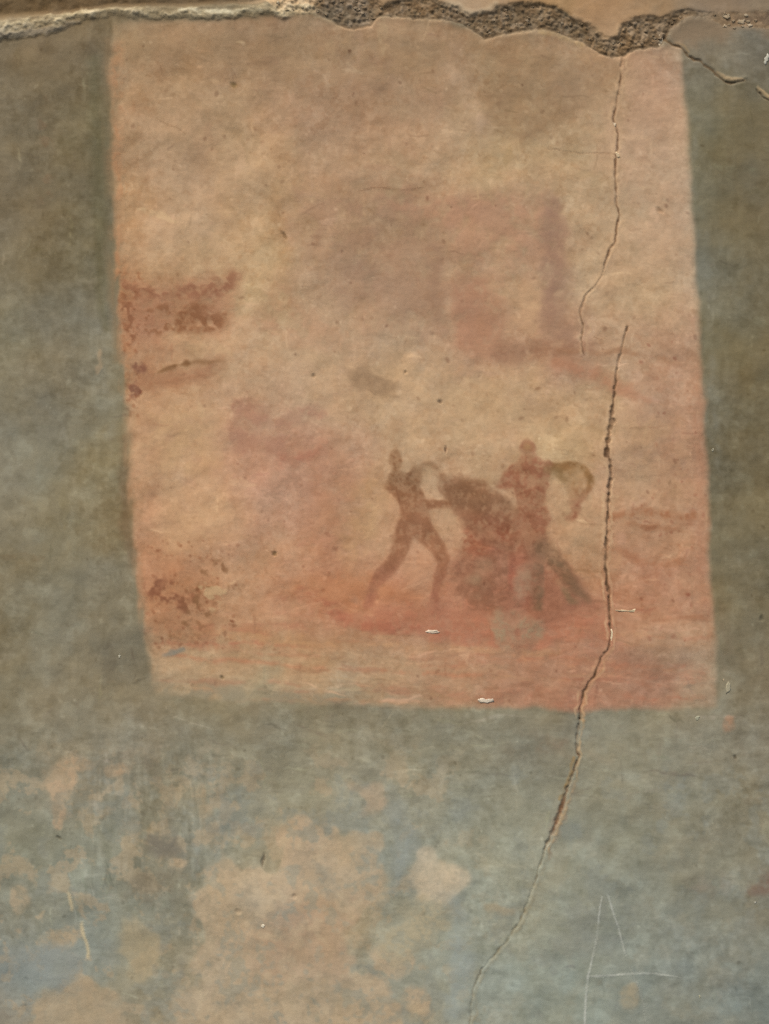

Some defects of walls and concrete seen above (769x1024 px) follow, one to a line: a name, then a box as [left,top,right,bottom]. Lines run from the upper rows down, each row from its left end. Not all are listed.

spalling [265,0,769,59]
crack [547,56,631,359]
crack [468,325,629,1024]